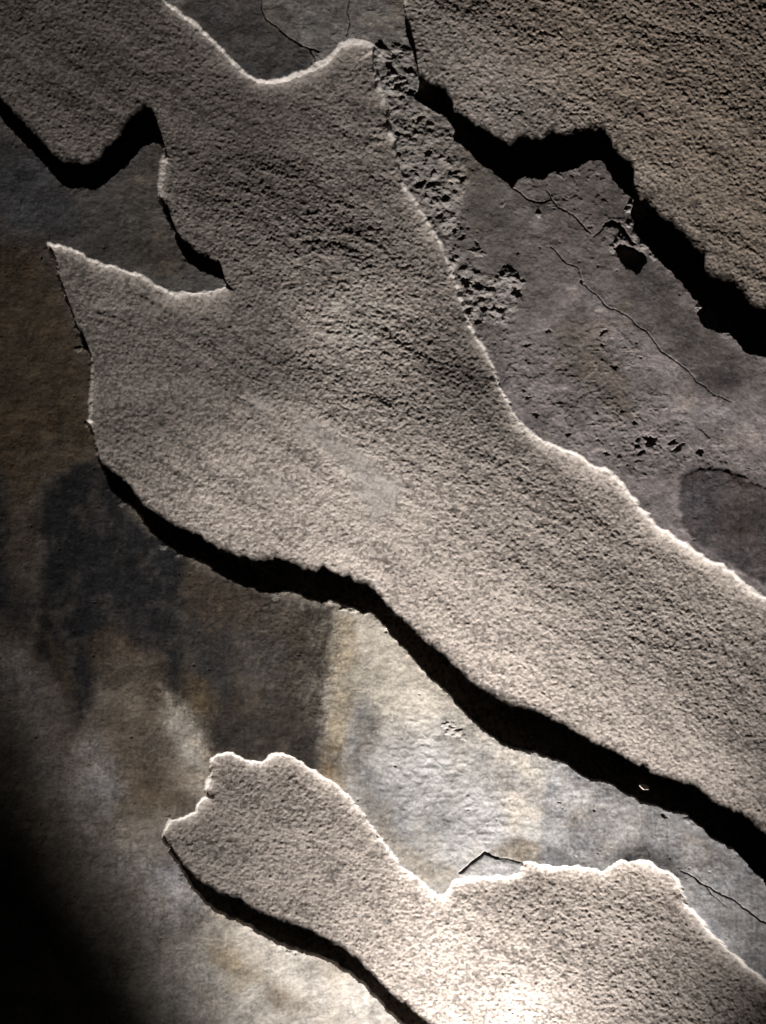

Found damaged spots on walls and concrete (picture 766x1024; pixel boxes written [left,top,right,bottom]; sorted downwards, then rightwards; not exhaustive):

crack [260,0,320,61]
flaking render [154,141,190,264]
crack [514,188,605,236]
flaking render [163,0,766,599]
crack [550,246,732,402]
flaking render [46,239,705,830]
flaking render [161,751,766,1024]
crack [681,871,766,924]